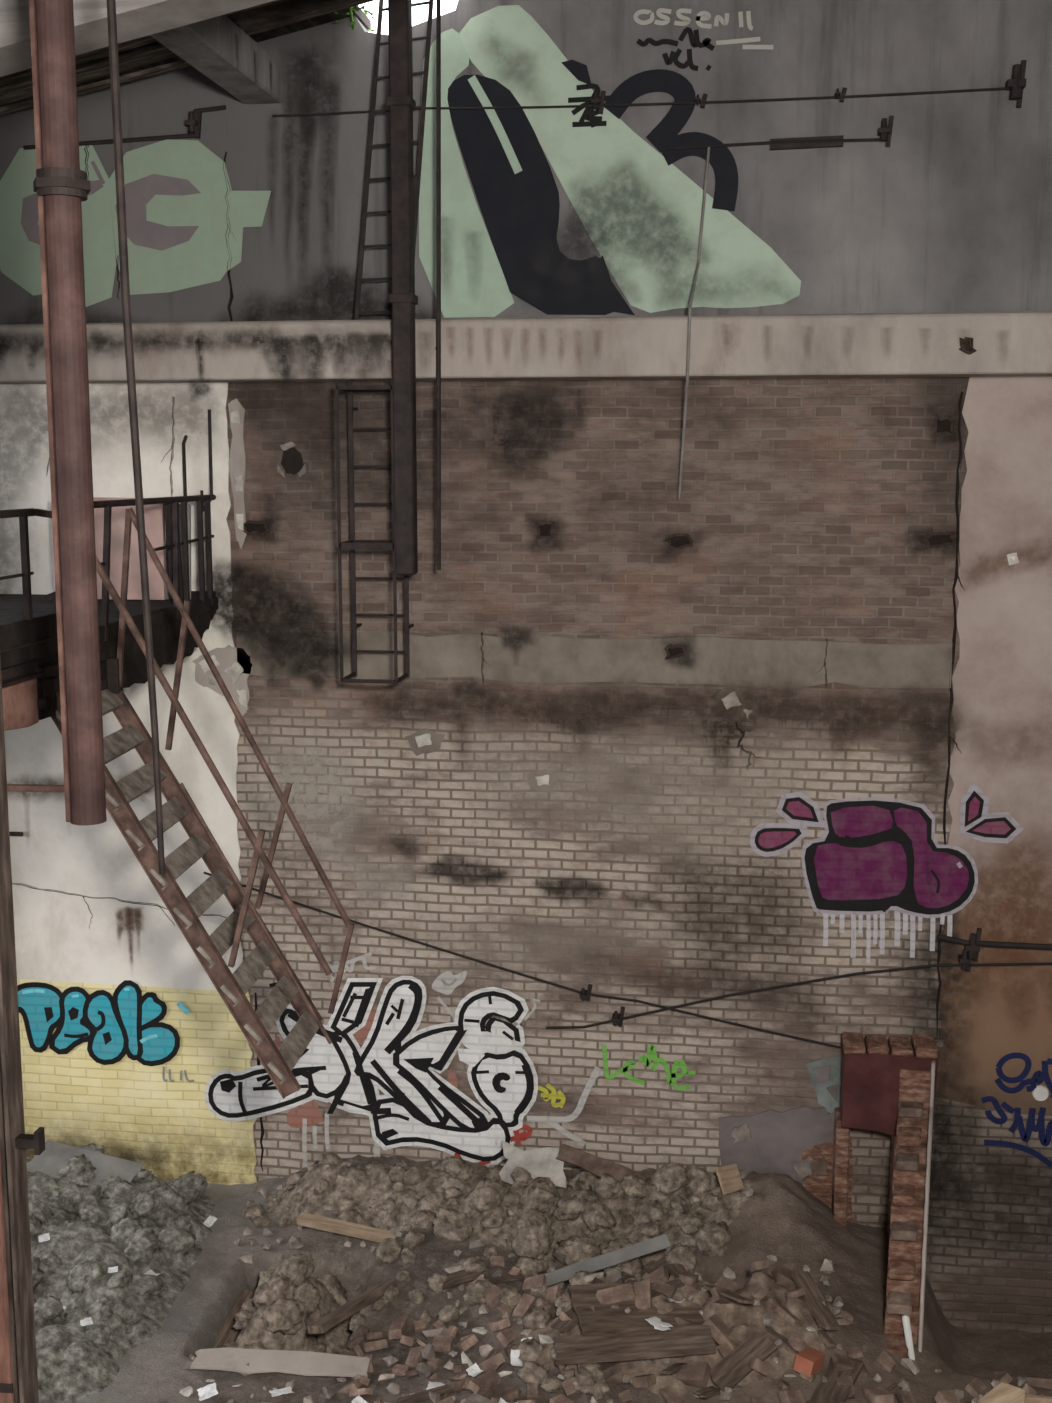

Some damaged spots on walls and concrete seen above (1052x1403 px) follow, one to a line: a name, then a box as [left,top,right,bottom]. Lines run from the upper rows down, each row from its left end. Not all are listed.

water stain [490,396,561,467]
flaking render [192,645,252,716]
water stain [377,683,952,743]